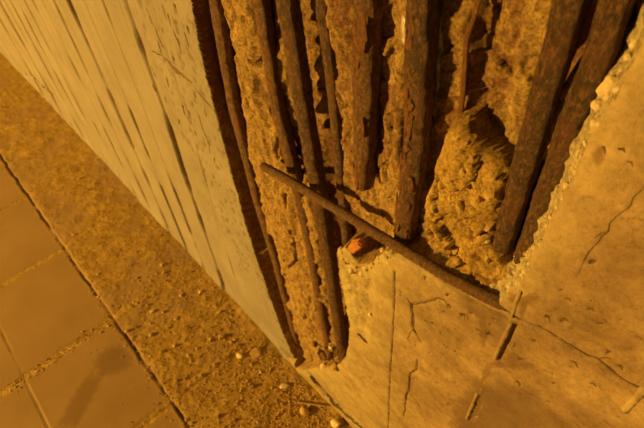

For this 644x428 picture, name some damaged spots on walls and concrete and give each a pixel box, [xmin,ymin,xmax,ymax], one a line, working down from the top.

spalling [152,0,346,369]
spalling [300,0,407,237]
corrosion [352,12,369,97]
spalling [330,211,397,346]
corrosion [395,57,415,238]
corrosion [404,5,417,51]
crack [388,271,446,427]
spalling [408,0,644,304]
crack [510,312,639,388]
crack [575,189,642,277]